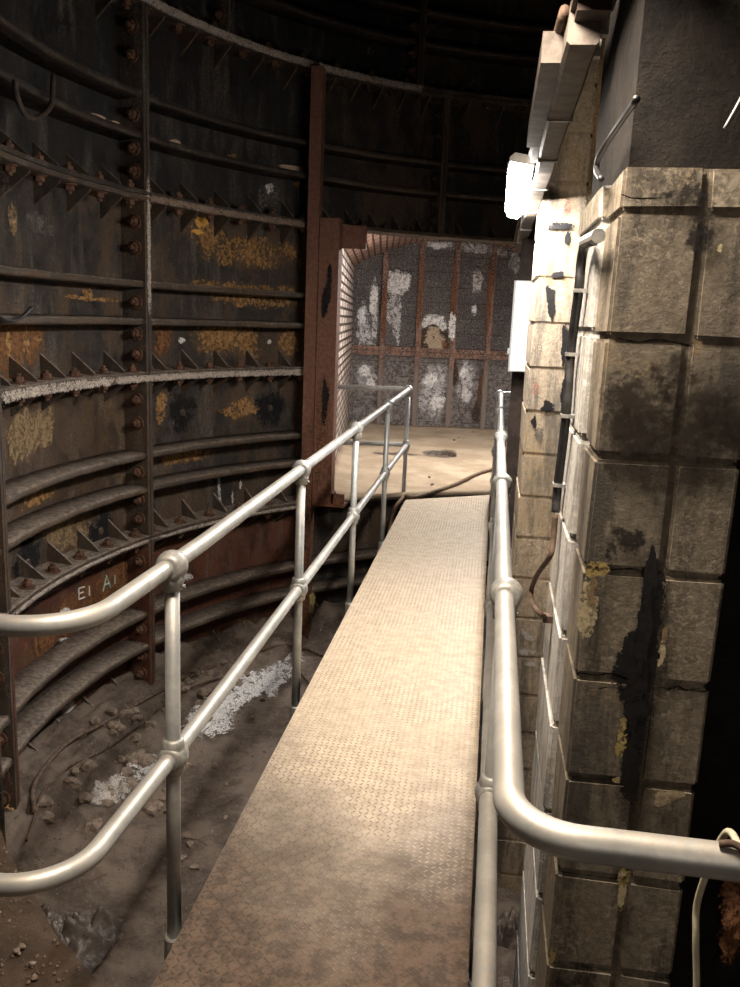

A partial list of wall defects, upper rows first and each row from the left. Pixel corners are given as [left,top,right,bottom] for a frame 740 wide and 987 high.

corrosion [0,312,46,379]
spalling [421,323,449,349]
corrosion [315,379,330,486]
water stain [601,356,740,466]
corrosion [717,881,740,963]